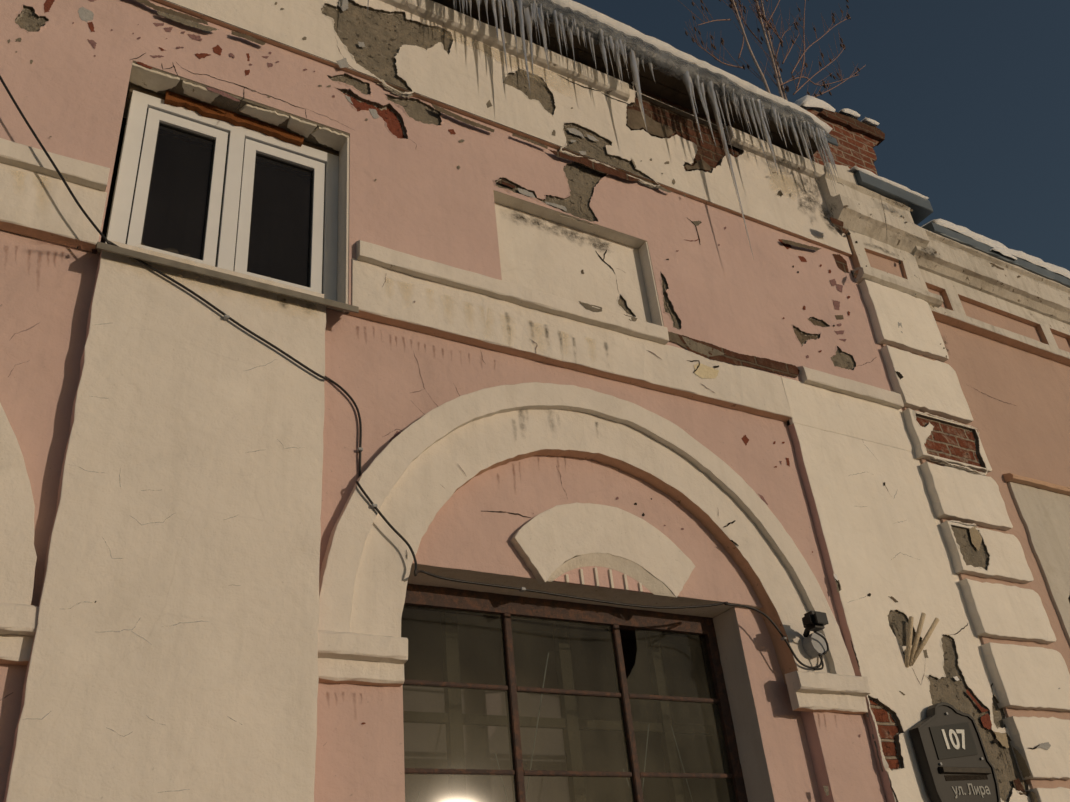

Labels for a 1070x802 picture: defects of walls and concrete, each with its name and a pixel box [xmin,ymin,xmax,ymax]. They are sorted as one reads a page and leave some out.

peeling [8,0,55,53]
peeling [137,11,279,76]
flaking render [303,0,464,147]
flaking render [492,67,675,226]
flaking render [625,81,744,173]
flaking render [659,272,800,393]
peeling [783,254,876,371]
flaking render [912,410,988,476]
flaking render [946,520,990,570]
flaking render [887,596,928,660]
flaking render [859,695,905,772]
flaking render [913,633,1051,802]